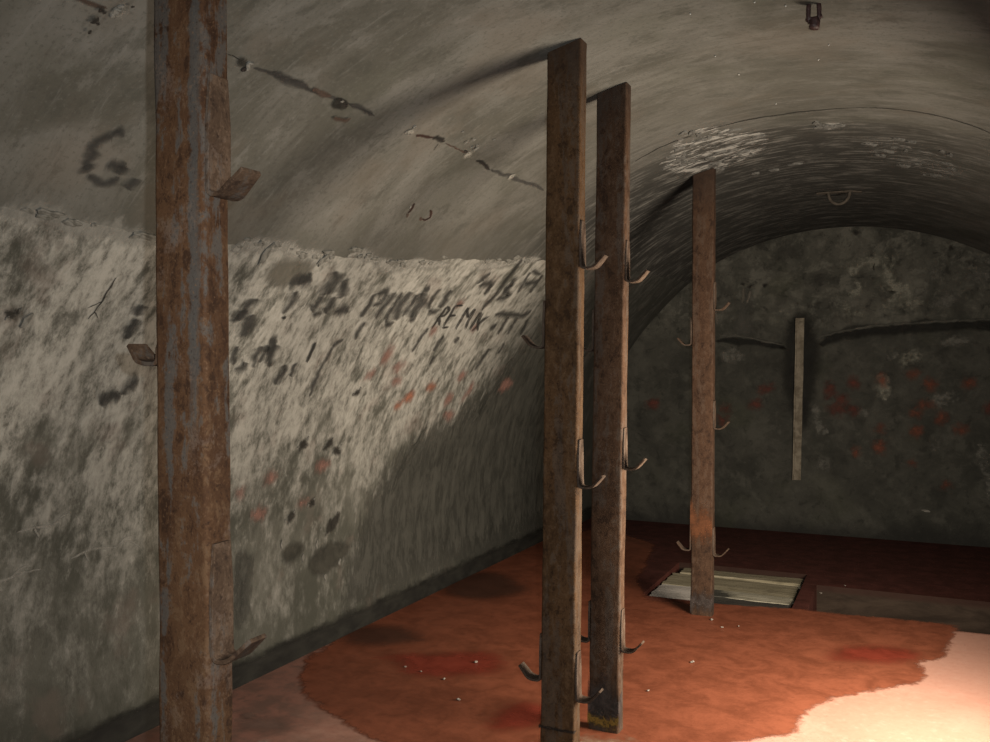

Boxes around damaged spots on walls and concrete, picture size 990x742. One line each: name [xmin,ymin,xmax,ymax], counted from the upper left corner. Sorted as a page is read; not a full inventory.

crack [228,54,374,116]
crack [416,135,544,191]
peeling [659,125,768,173]
crack [816,319,990,346]
damp [341,325,545,616]
rust [690,504,712,538]
damp [298,541,543,742]
damp [580,530,957,742]